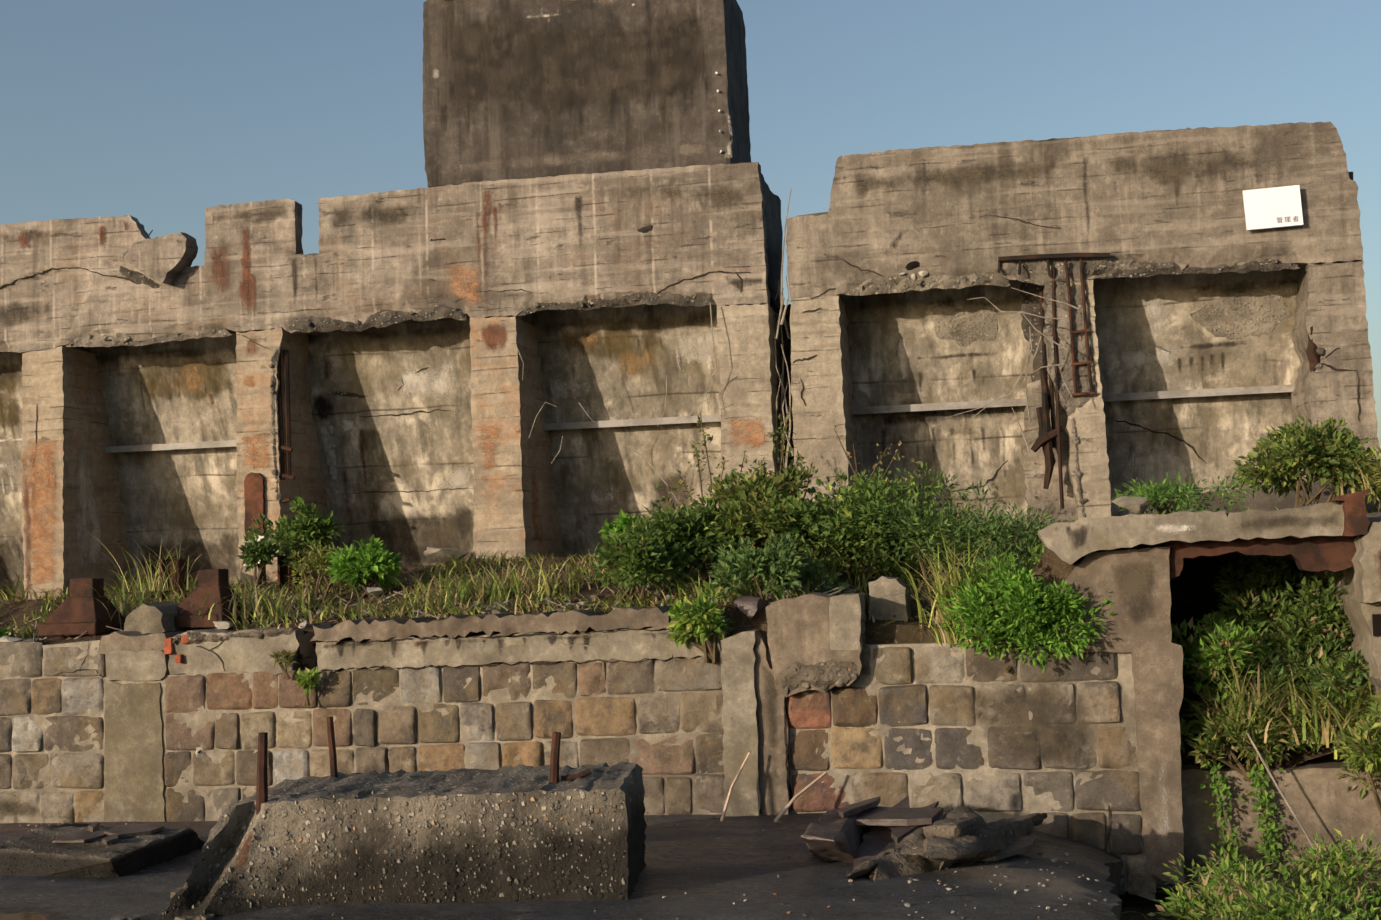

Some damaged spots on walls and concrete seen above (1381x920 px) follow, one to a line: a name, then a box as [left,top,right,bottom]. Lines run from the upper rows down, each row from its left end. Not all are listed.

crack [0,267,137,289]
corrosion [212,231,255,307]
crack [657,270,751,294]
spalling [518,292,716,316]
spalling [843,253,1300,517]
crack [1321,348,1361,421]
crack [1116,420,1206,463]